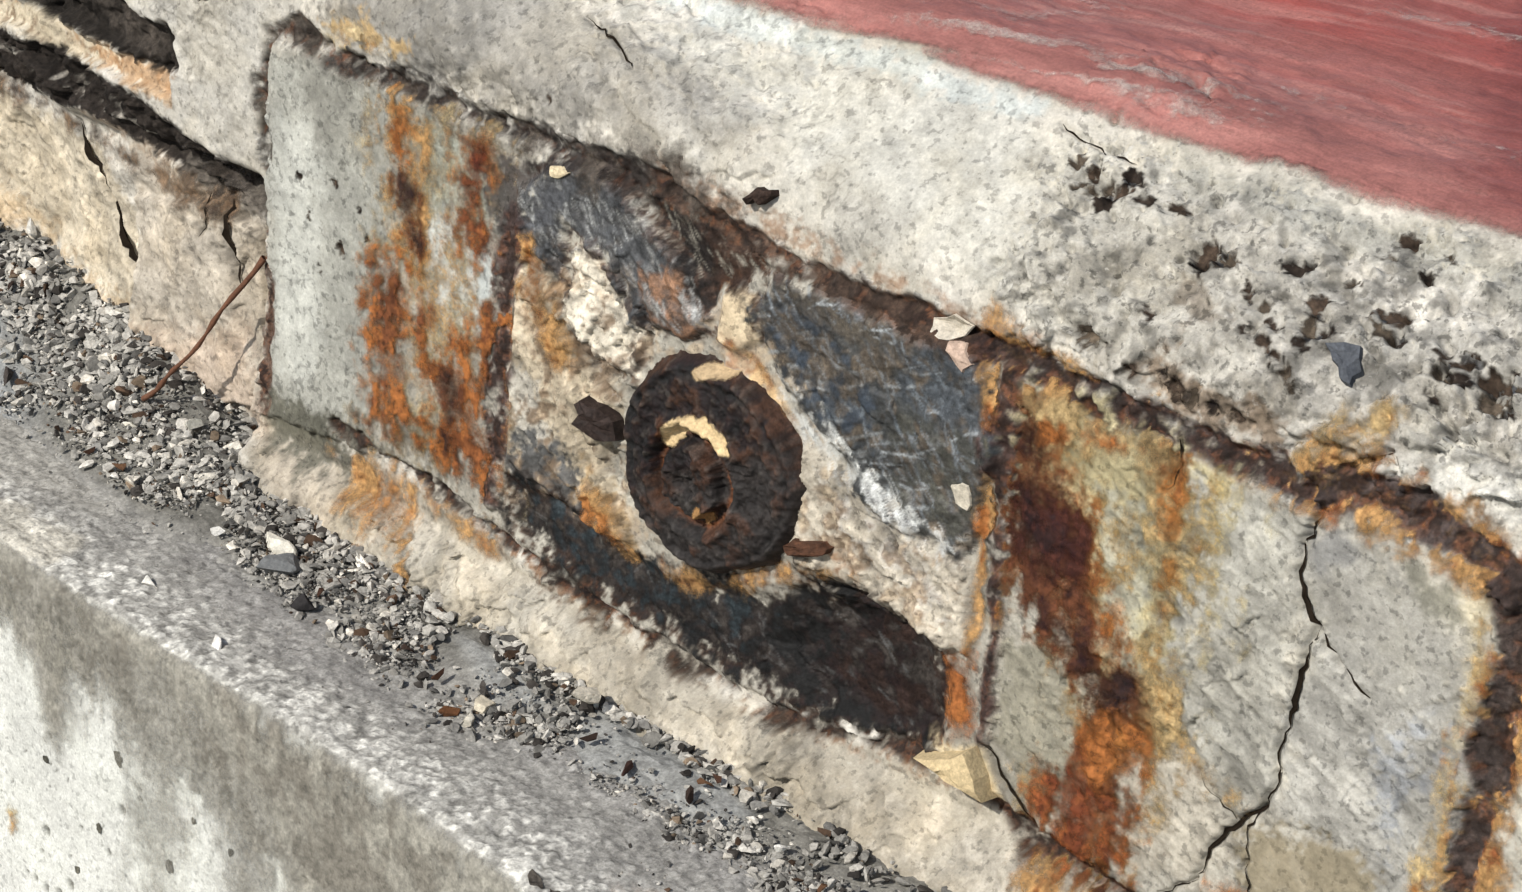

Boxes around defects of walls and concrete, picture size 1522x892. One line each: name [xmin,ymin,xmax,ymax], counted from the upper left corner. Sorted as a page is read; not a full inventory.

crack [81,122,138,262]
spalling [0,0,268,213]
rust [334,84,567,578]
rust [577,490,639,561]
peeling [930,314,975,373]
peeling [951,483,972,511]
rust [944,301,1243,892]
rust [1293,399,1397,478]
rust [1292,499,1497,594]
leakage [0,543,519,892]
crack [1164,517,1370,892]
rust [1409,696,1522,892]